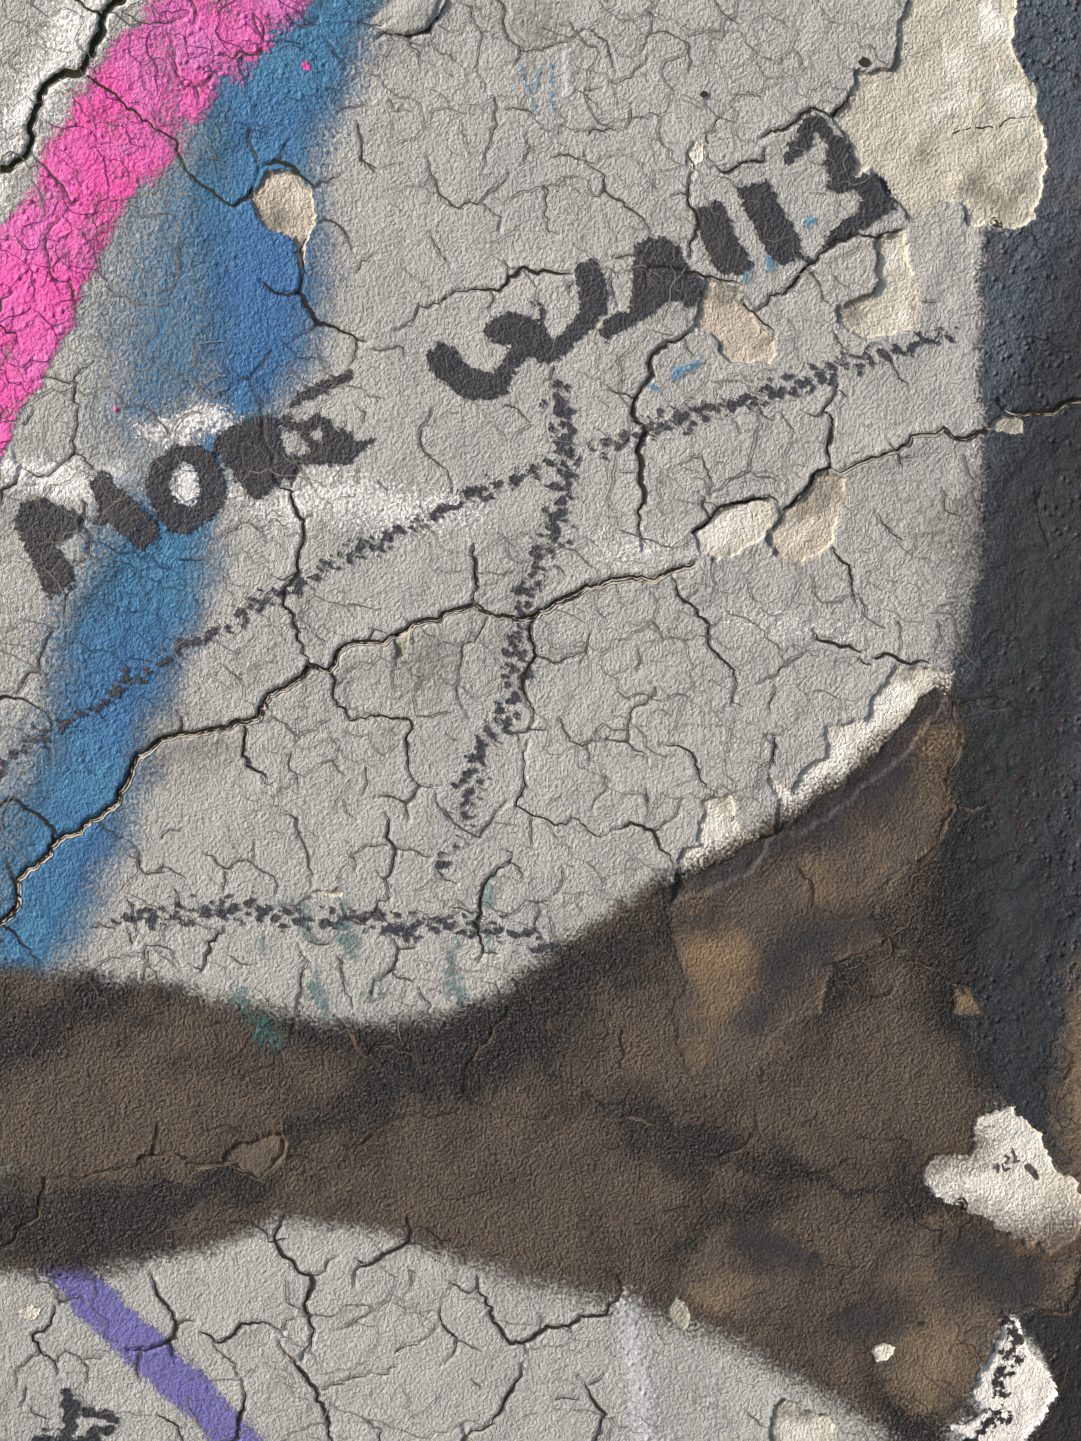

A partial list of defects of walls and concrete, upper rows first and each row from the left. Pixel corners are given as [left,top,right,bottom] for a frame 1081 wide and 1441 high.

peeling [250,169,317,269]
spalling [830,0,1048,341]
peeling [694,279,776,365]
crack [0,0,1081,1137]
peeling [694,470,848,564]
crack [312,1088,460,1168]
crack [597,1094,793,1230]
crack [973,1005,1081,1178]
crack [0,1126,682,1441]
peeling [652,1106,1081,1441]
crack [703,1194,1081,1441]
crack [690,1388,767,1441]